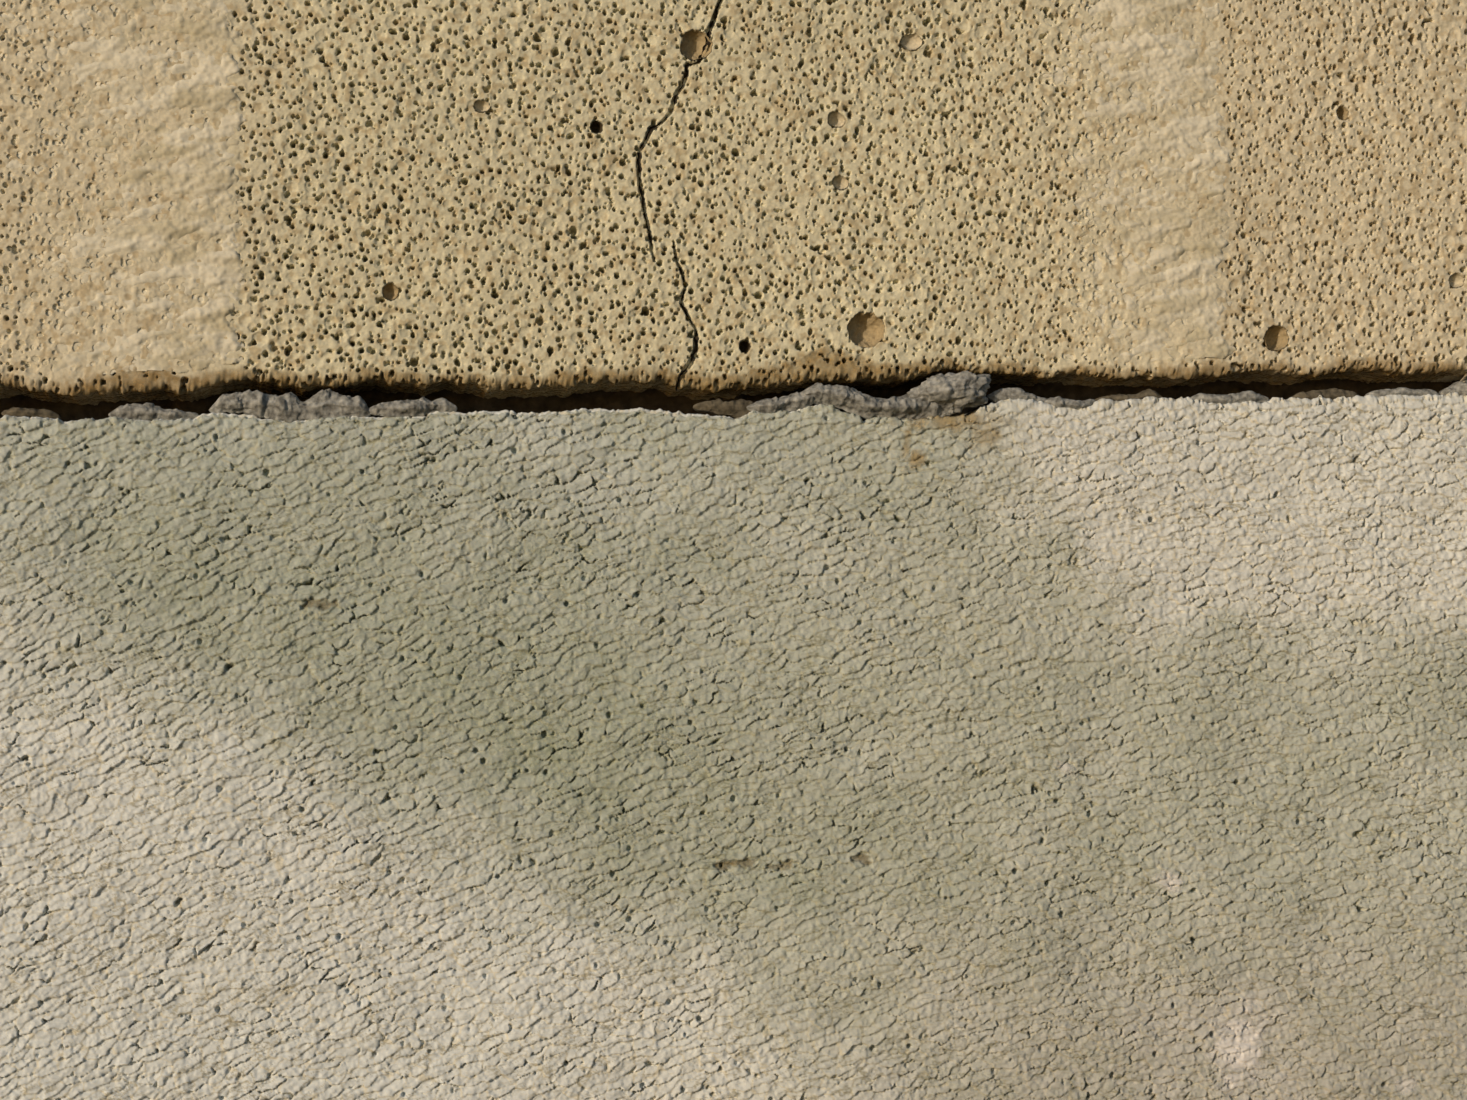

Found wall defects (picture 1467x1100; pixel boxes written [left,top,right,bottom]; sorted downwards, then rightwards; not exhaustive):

crack [637,0,725,391]